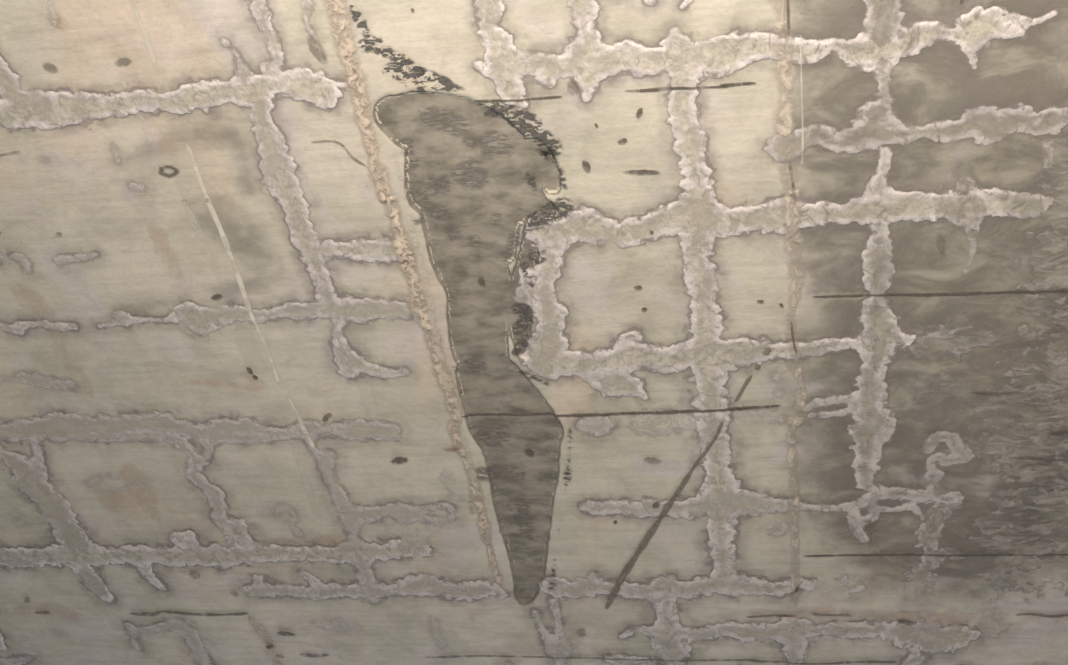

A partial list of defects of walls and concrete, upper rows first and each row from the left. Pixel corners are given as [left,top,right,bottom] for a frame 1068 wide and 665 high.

crack [627,82,755,92]
crack [475,95,561,103]
crack [814,289,1068,297]
damp [472,0,1068,665]
crack [462,405,780,417]
crack [1015,430,1068,461]
crack [805,551,1068,559]
crack [130,609,247,617]
crack [748,611,850,619]
crack [1017,611,1068,619]
crack [436,655,895,665]